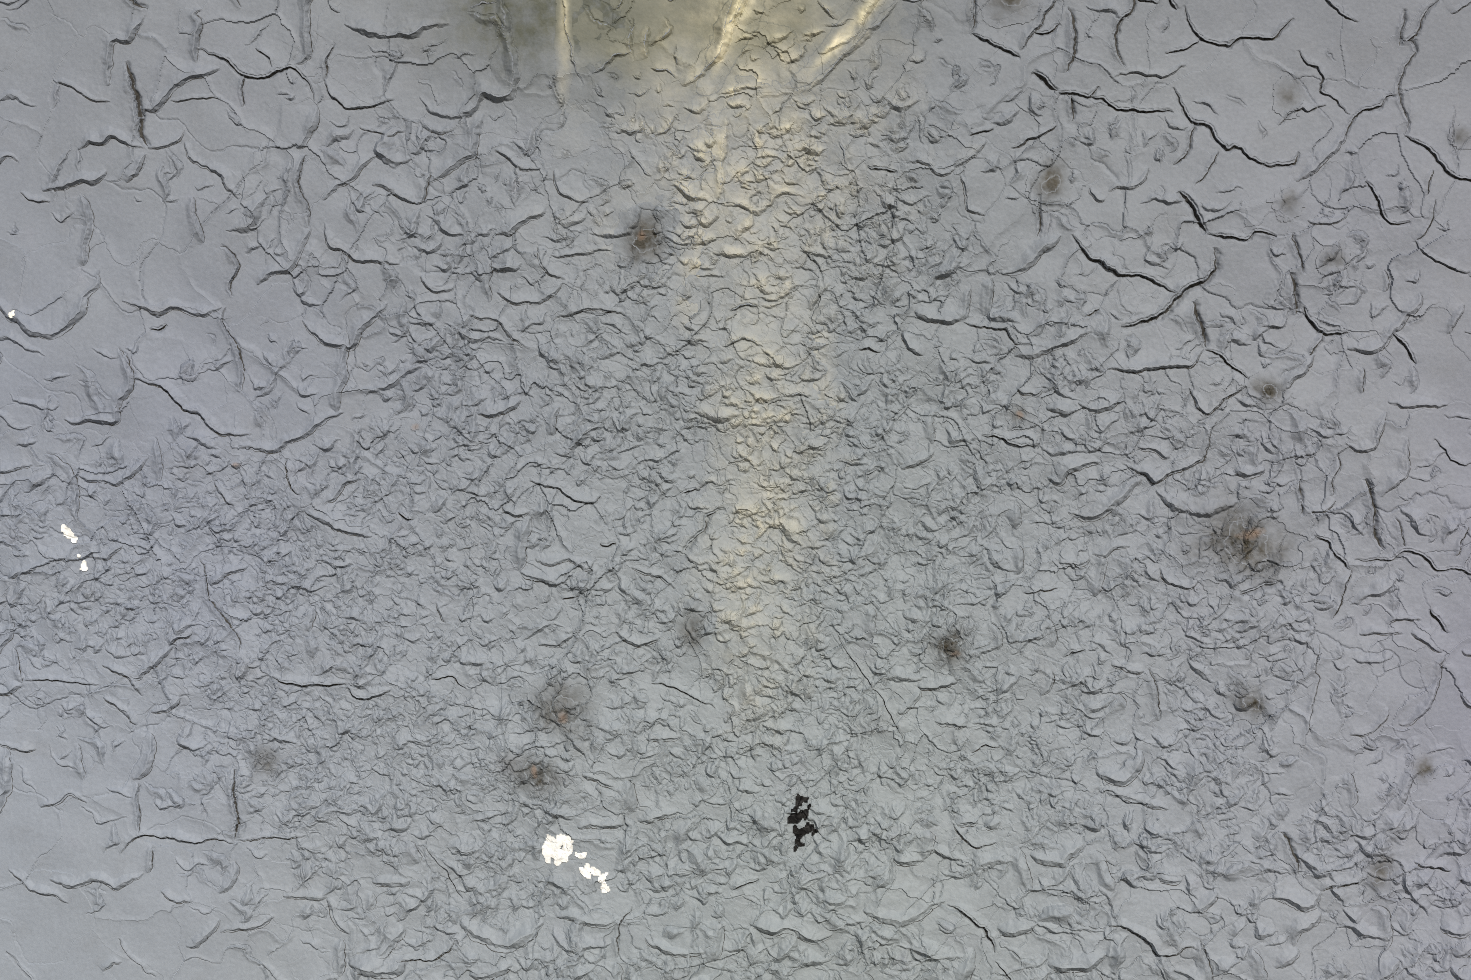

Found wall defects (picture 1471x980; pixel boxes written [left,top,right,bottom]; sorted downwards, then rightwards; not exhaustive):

crack [124,63,148,148]
crack [196,43,389,110]
crack [964,0,1471,485]
crack [217,246,245,374]
crack [131,376,251,437]
crack [1296,452,1471,619]
crack [1430,609,1449,633]
crack [272,675,391,700]
crack [119,769,305,854]
peeling [1096,751,1169,810]
crack [948,904,1016,980]
crack [1108,922,1214,980]